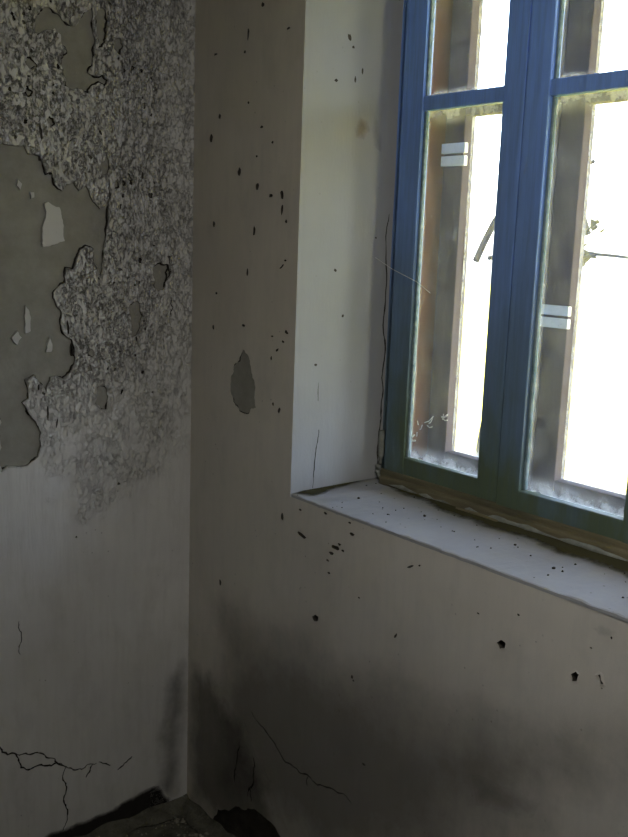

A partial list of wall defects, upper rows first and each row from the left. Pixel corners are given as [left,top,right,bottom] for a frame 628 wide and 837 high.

peeling [1,0,112,107]
peeling [0,116,173,473]
peeling [229,348,257,416]
crack [0,747,132,830]